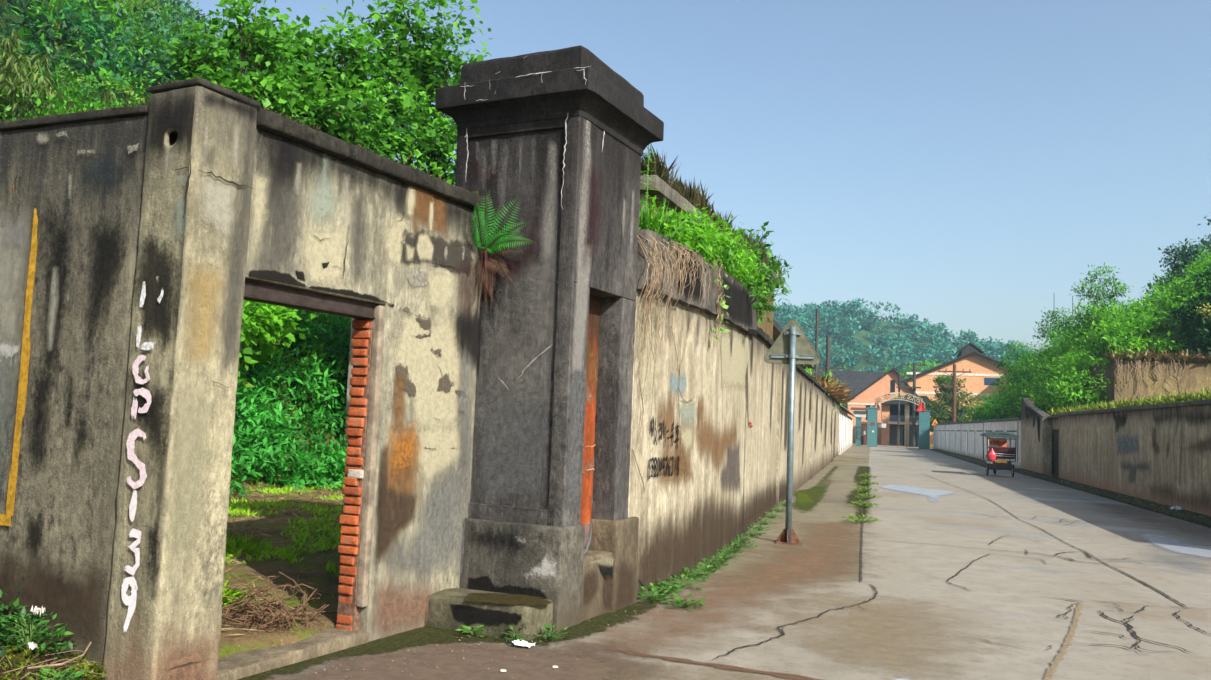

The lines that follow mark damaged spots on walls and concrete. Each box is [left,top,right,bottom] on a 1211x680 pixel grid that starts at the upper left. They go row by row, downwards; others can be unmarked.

leakage [133,179,188,347]
leakage [146,94,299,366]
leakage [26,214,70,469]
peeling [249,216,473,480]
leakage [721,278,753,387]
leakage [131,373,166,459]
rust [379,376,418,545]
leakage [659,398,740,490]
leakage [584,482,786,607]
crack [929,514,1144,591]
crack [712,584,878,660]
crack [971,603,1210,654]